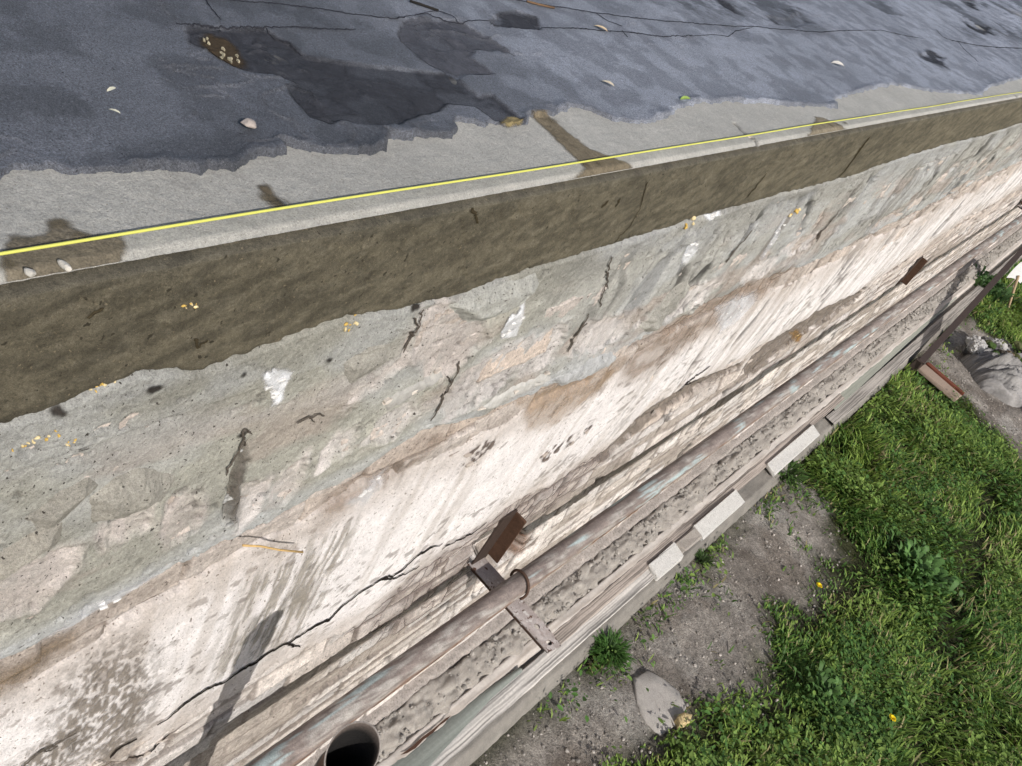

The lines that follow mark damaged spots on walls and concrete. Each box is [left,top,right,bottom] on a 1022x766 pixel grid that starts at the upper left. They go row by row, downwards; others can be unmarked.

peeling [202,37,240,64]
crack [176,0,490,56]
crack [519,0,1022,61]
water stain [534,110,632,178]
water stain [3,219,126,282]
crack [110,522,487,758]